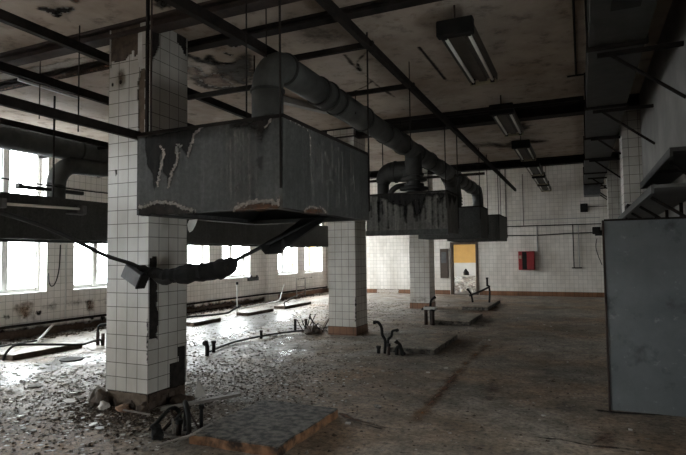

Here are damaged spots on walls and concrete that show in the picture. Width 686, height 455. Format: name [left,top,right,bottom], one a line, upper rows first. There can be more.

peeling [26,57,94,74]
damp [188,54,254,84]
peeling [106,24,201,189]
peeling [146,277,158,363]
peeling [107,346,185,409]